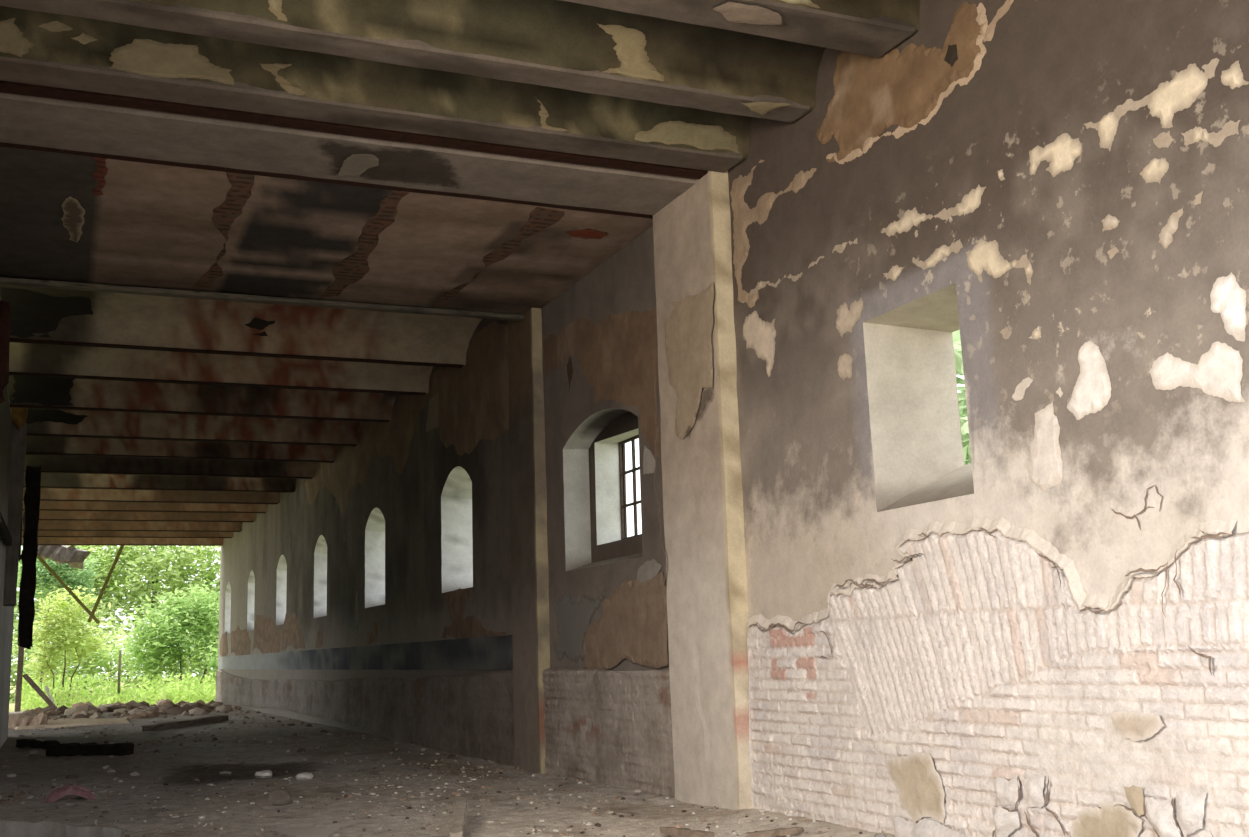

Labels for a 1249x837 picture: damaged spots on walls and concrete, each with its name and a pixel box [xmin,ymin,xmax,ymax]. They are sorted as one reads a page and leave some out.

peeling [109,39,235,86]
peeling [598,24,665,81]
peeling [634,121,741,154]
peeling [713,0,820,25]
peeling [730,0,1034,381]
peeling [1029,58,1249,184]
peeling [1159,191,1203,249]
peeling [1149,272,1247,403]
peeling [1028,340,1111,493]
crack [1112,485,1163,530]
flaking render [542,559,675,798]
flaking render [747,517,1249,837]